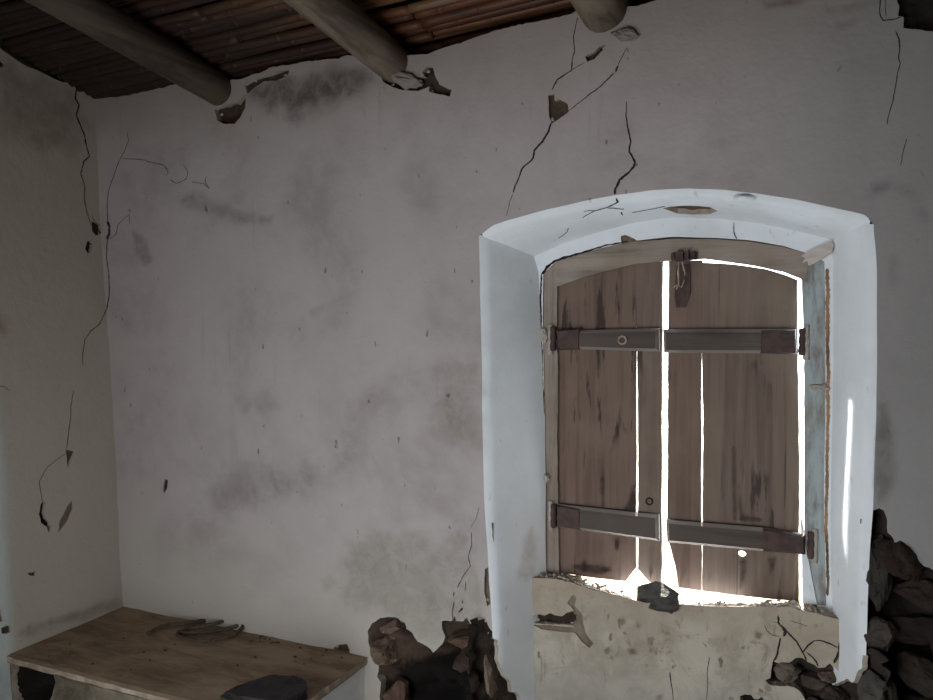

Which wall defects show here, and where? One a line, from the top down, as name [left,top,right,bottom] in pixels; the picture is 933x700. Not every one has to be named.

crack [552,18,585,90]
crack [879,0,901,123]
flaking render [897,0,933,31]
crack [506,49,629,215]
crack [75,90,209,362]
flaking render [369,617,517,700]
crack [765,616,839,666]
flaking render [769,508,933,700]